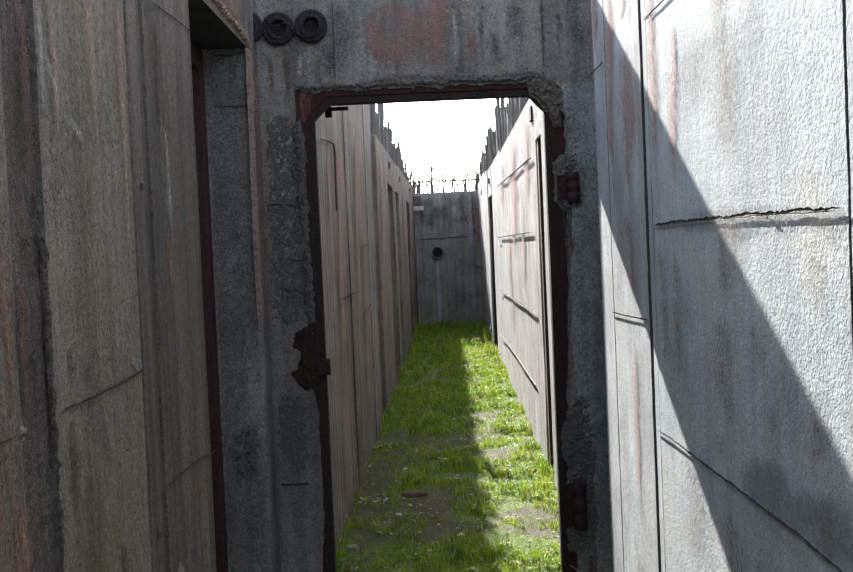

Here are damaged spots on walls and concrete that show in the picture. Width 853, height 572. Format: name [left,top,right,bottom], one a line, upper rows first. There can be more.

spalling [294,70,564,128]
spalling [290,119,319,391]
crack [654,207,846,226]
spalling [561,395,600,554]